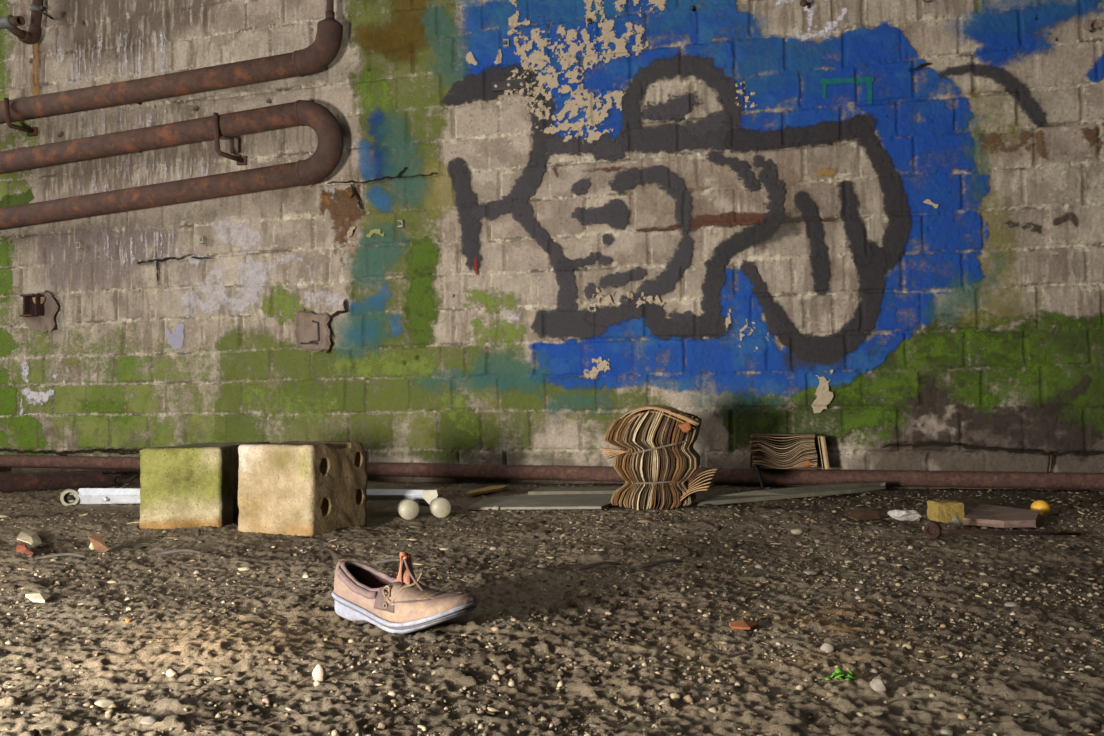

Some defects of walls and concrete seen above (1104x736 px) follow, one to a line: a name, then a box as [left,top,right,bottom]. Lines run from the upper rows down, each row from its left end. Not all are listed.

corrosion [32,41,40,96]
damp [355,0,441,64]
peeling [494,0,667,144]
corrosion [320,184,365,264]
damp [19,362,68,415]
damp [889,376,1102,461]